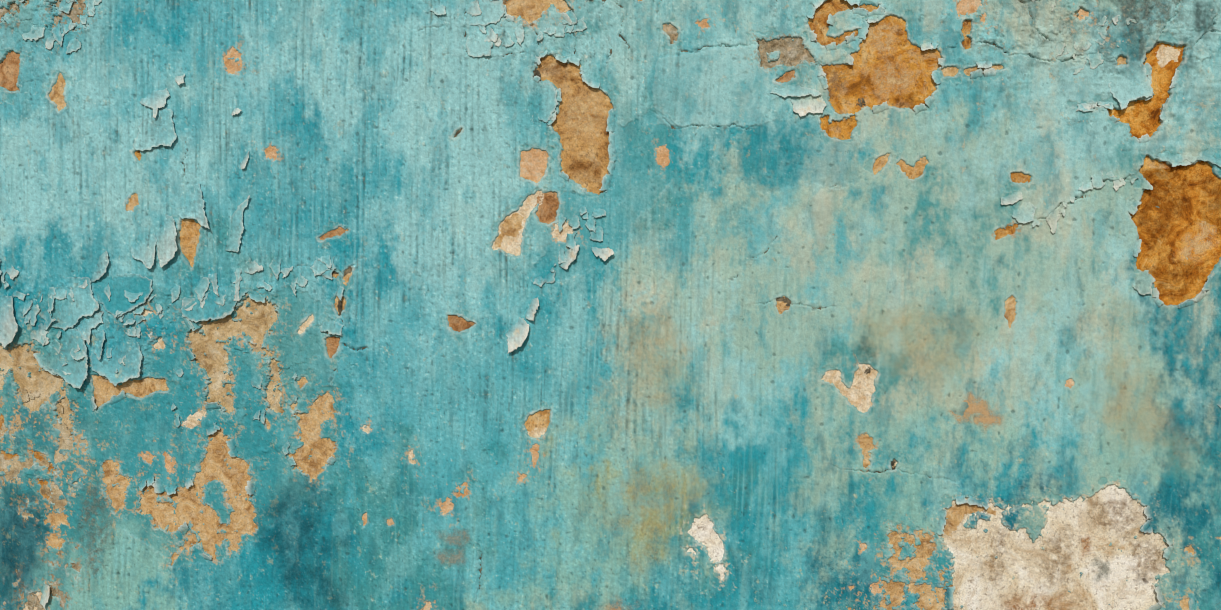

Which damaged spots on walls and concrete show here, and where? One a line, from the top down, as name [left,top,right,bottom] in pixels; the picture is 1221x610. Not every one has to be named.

peeling [0,0,102,91]
peeling [758,0,1004,140]
peeling [465,0,617,354]
peeling [994,9,1221,309]
peeling [1004,296,1017,328]
peeling [0,183,352,610]
spalling [821,363,878,413]
spalling [684,514,726,579]
spalling [870,484,1195,610]